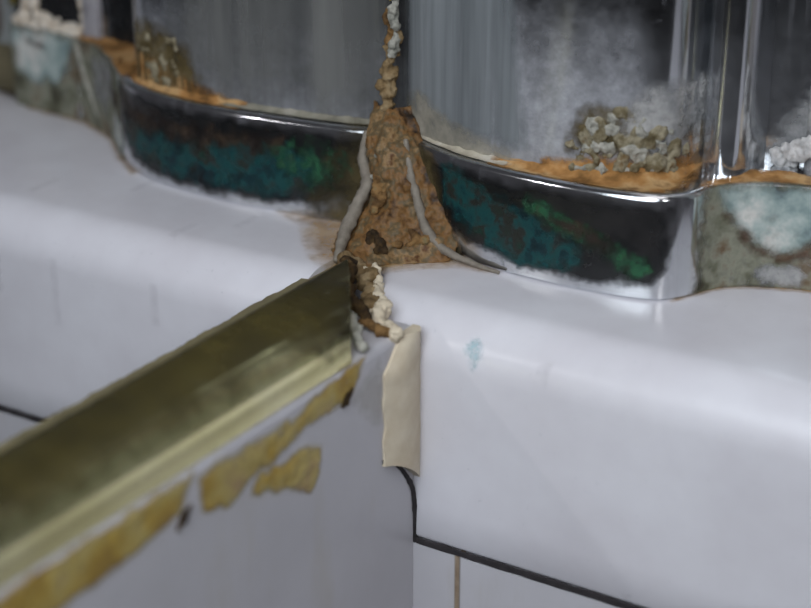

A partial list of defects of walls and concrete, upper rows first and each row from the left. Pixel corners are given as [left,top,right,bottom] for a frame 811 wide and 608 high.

leakage [30,0,80,25]
leakage [565,78,705,175]
corrosion [694,169,811,191]
corrosion [0,34,701,511]
peeling [0,358,365,608]